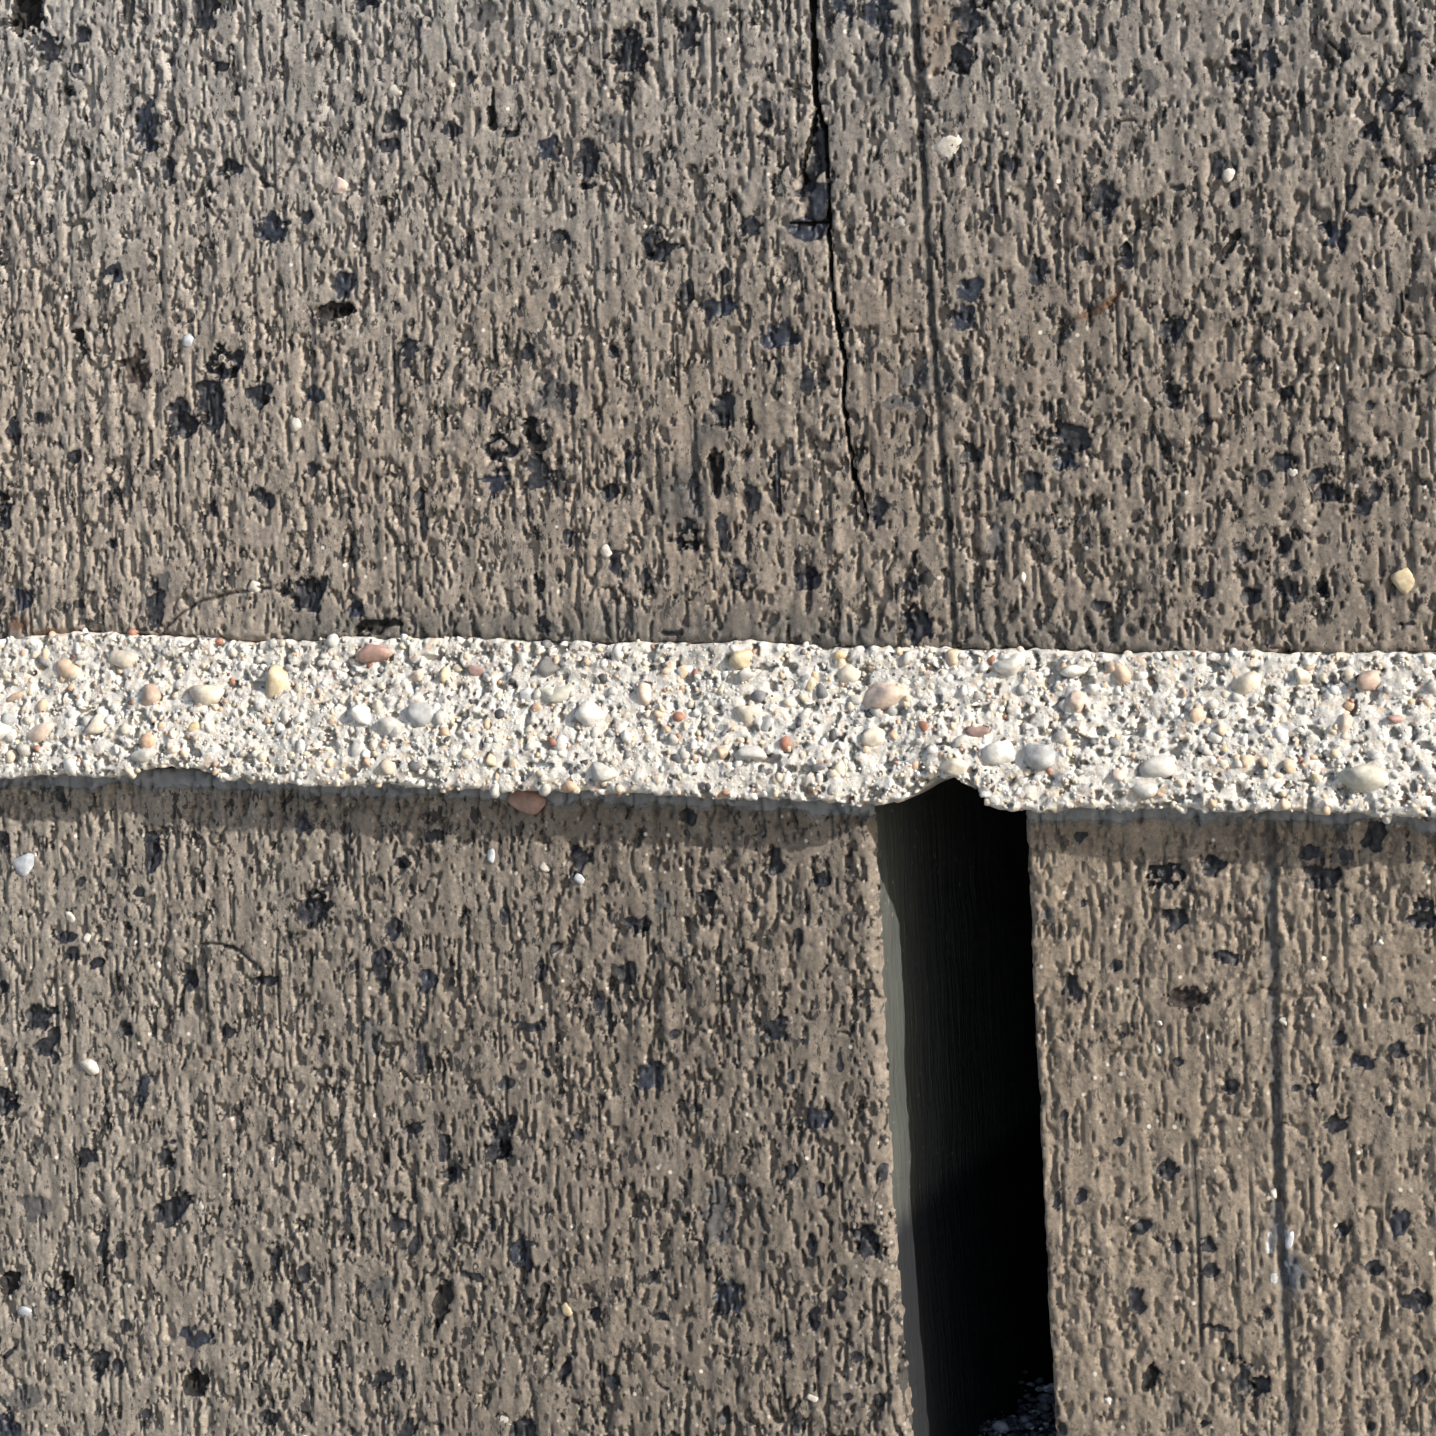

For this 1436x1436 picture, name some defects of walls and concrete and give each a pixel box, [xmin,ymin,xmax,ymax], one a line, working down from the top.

crack [790,0,869,518]